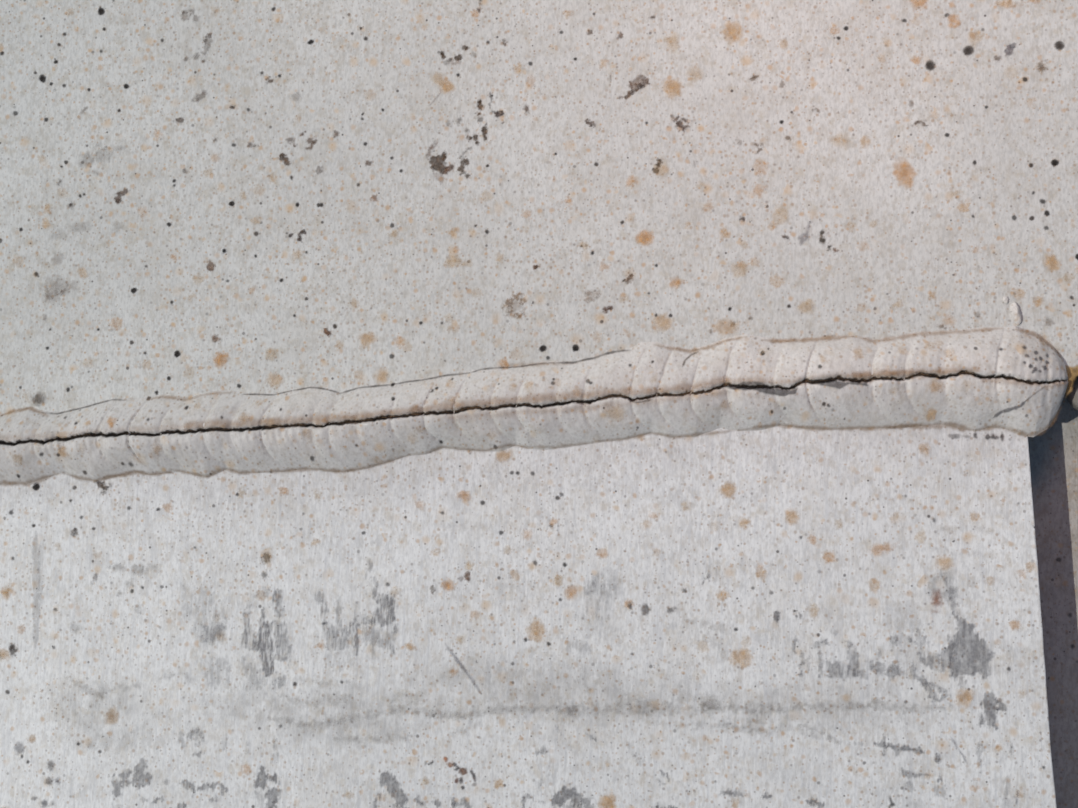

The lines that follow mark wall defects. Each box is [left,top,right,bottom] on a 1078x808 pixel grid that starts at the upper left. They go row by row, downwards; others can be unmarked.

crack [0,371,1066,446]